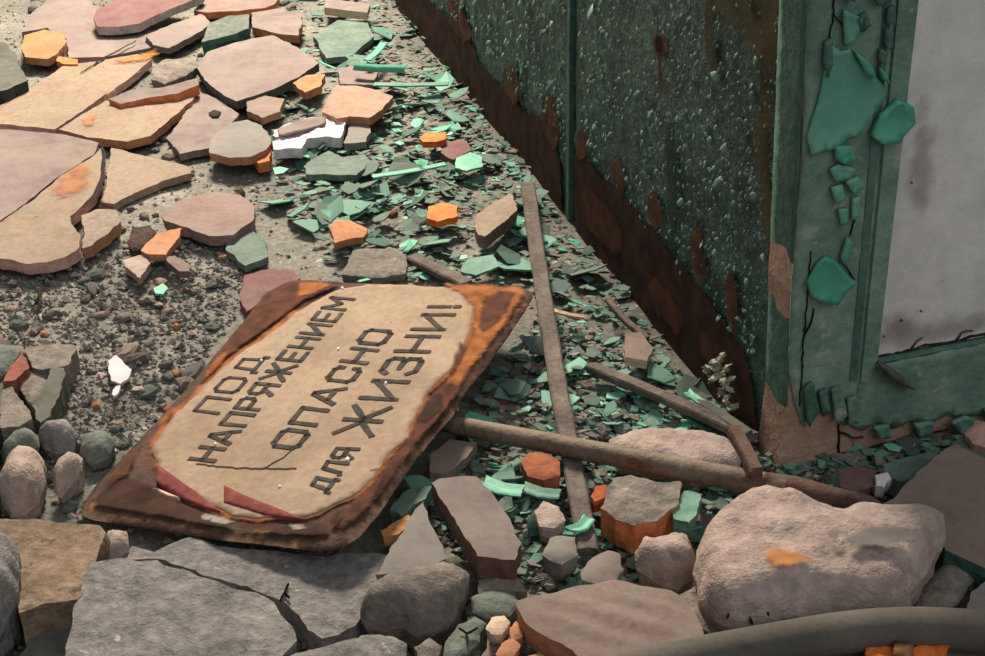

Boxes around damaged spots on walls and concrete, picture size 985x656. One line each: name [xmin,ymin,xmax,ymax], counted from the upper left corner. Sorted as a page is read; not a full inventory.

corrosion [391,0,562,213]
peeling [431,0,777,354]
corrosion [653,33,666,94]
crack [829,0,843,39]
peeling [806,0,916,305]
corrosion [574,128,758,445]
crack [799,251,814,407]
peeling [803,381,860,427]